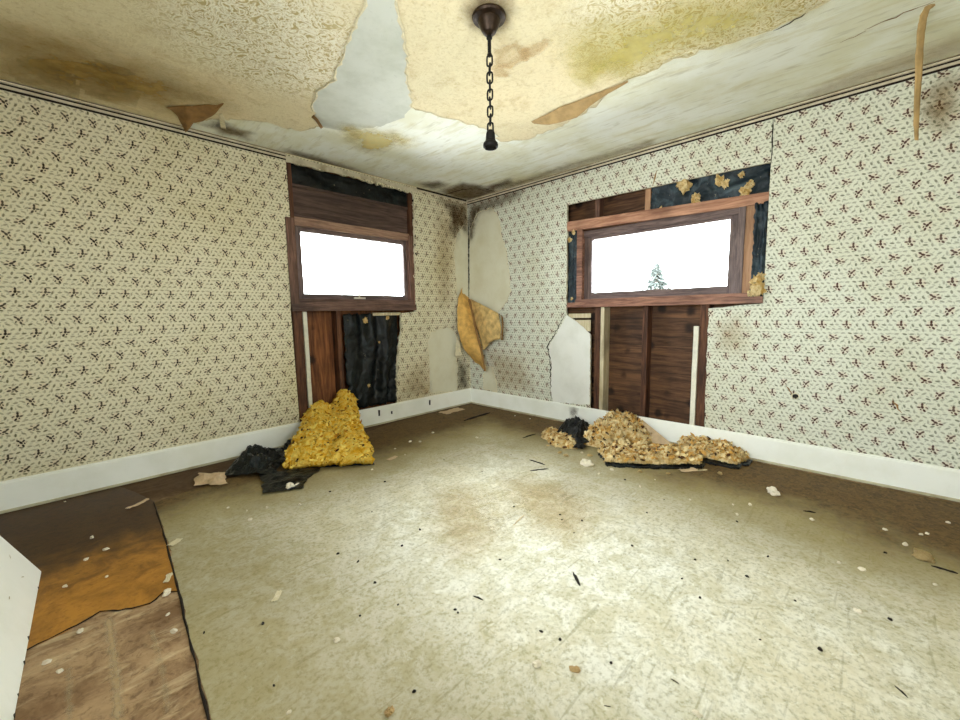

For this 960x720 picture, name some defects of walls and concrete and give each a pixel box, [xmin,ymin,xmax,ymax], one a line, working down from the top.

water stain [8,42,192,102]
peeling [913,4,935,141]
peeling [166,103,226,132]
peeling [531,81,628,125]
flaking render [286,156,417,278]
water stain [423,181,511,235]